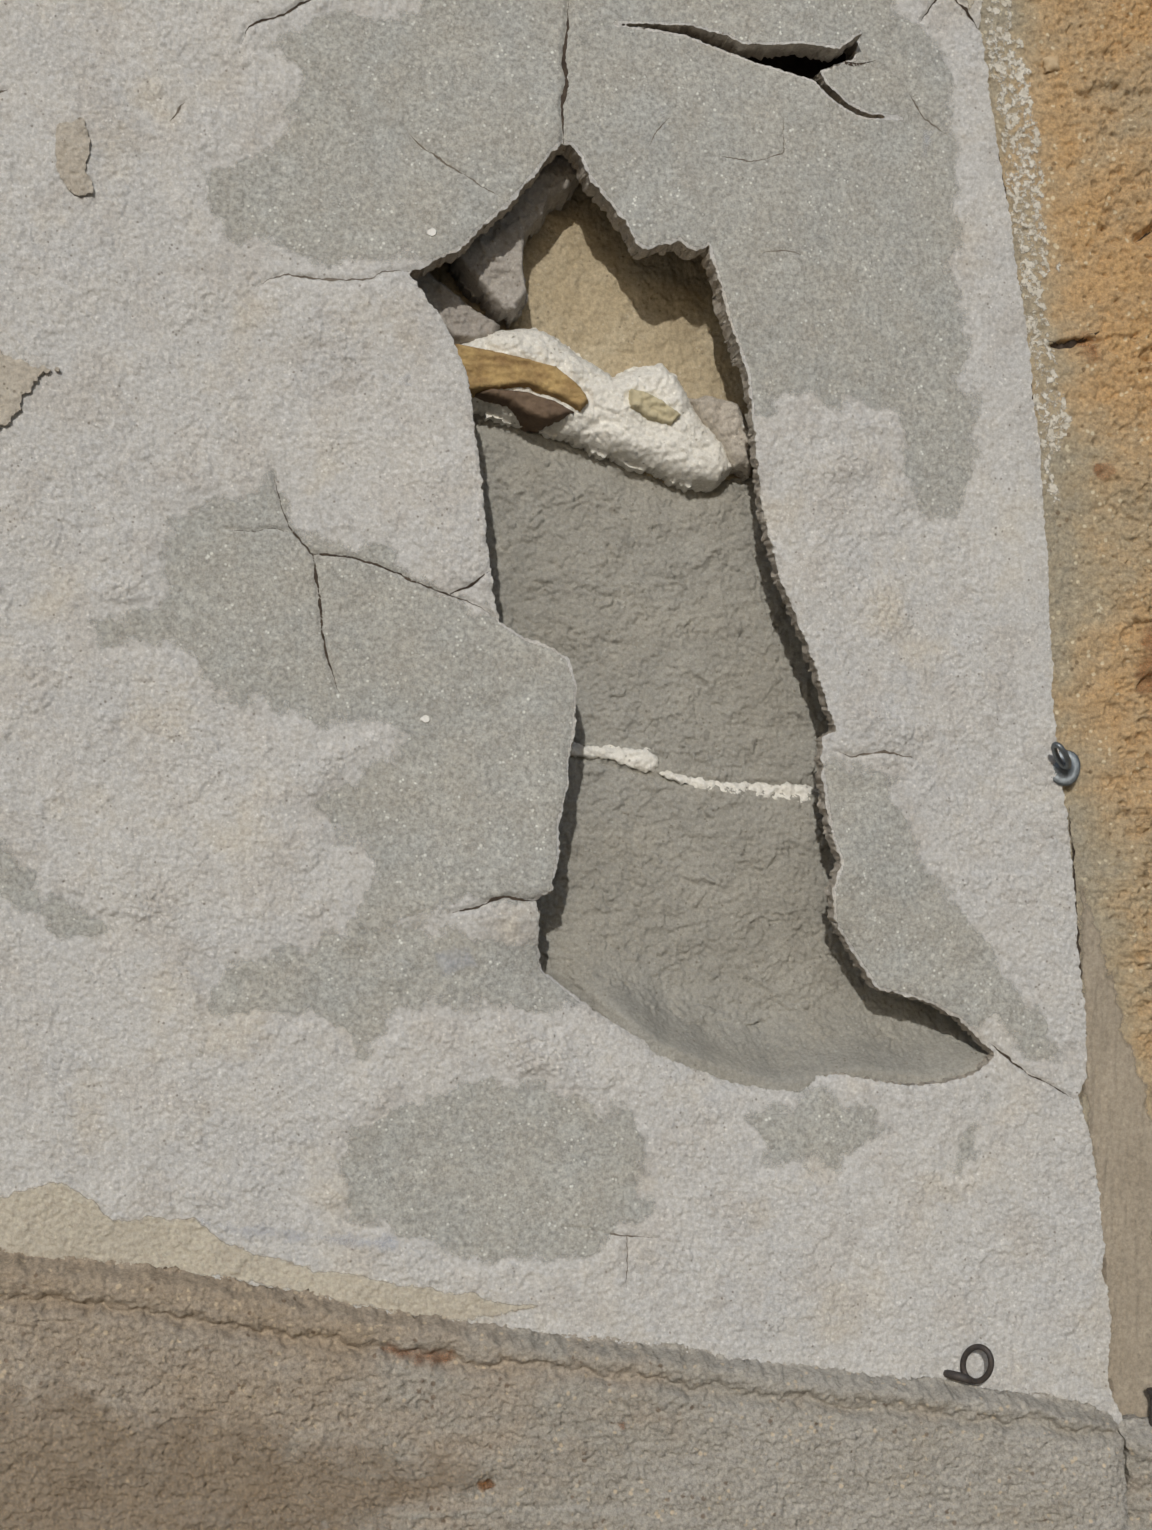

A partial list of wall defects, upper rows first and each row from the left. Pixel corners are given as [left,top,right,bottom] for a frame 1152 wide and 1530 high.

crack [712,46,875,79]
crack [236,460,498,690]
spalling [96,0,1057,1093]